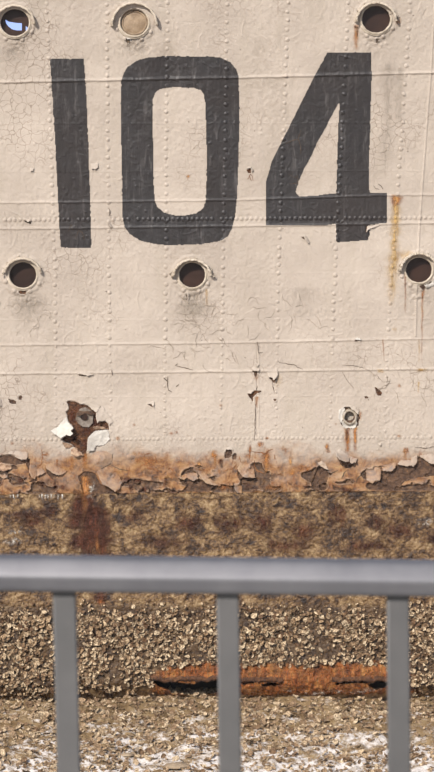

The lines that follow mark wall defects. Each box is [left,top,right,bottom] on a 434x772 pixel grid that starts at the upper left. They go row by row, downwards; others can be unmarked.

rust [391,196,401,284]
peeling [51,401,114,457]
peeling [0,451,67,483]
rust [68,419,110,556]
peeling [79,467,122,494]
peeling [177,470,218,492]
peeling [225,447,256,494]
spalling [311,460,341,490]
peeling [336,449,358,468]
peeling [365,454,434,490]
rust [149,662,218,695]
rust [240,661,387,696]